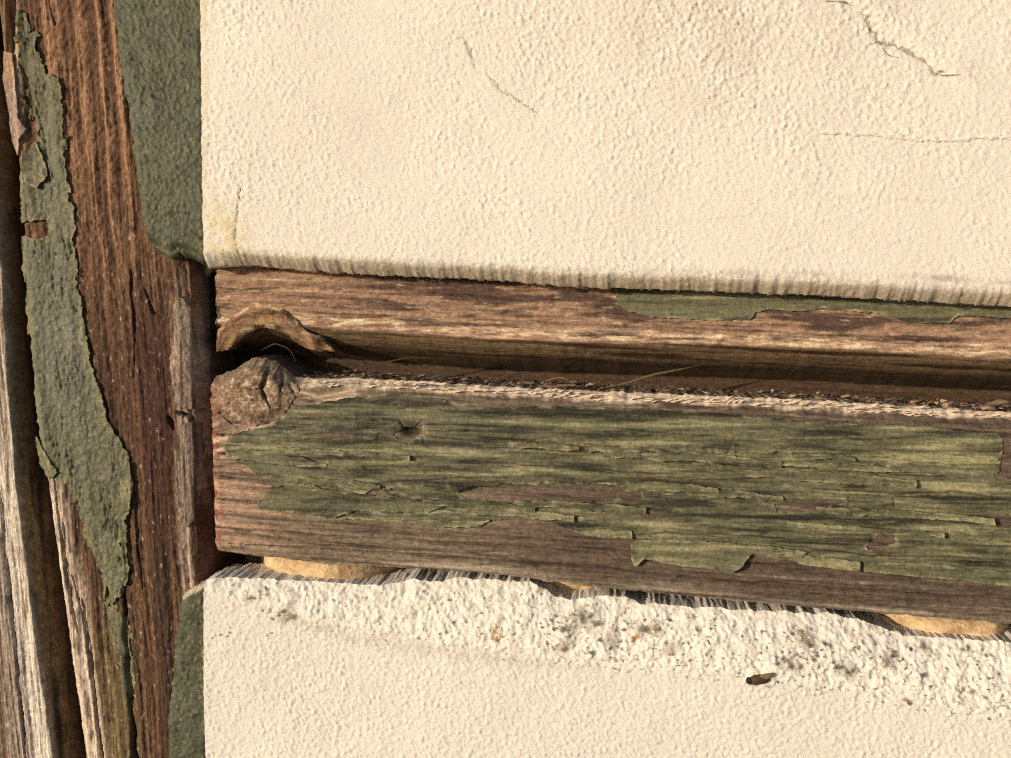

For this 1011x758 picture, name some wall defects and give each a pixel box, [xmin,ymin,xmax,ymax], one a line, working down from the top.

crack [827,1,959,76]
crack [811,128,1011,142]
peeling [13,9,137,707]
peeling [223,393,1011,587]